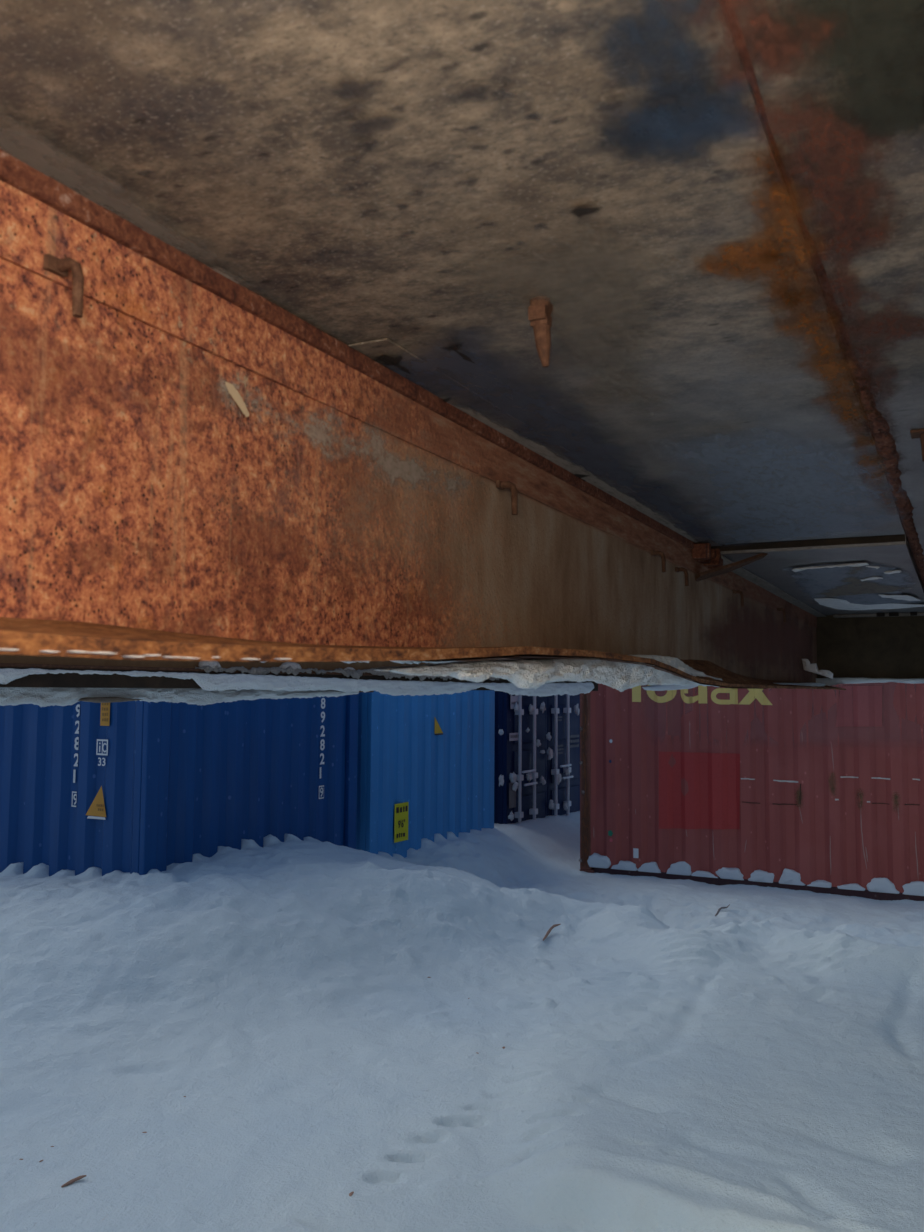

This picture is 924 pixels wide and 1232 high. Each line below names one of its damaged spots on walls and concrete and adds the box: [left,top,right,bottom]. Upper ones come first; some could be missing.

peeling [789,563,924,611]